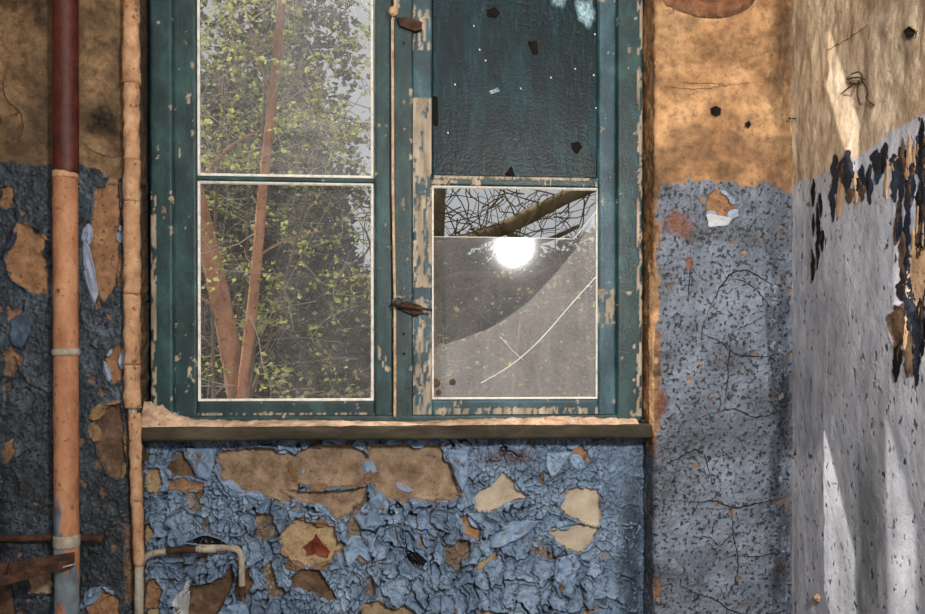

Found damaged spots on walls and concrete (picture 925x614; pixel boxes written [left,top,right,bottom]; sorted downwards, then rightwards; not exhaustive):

crack [0,70,24,144]
spalling [1,221,53,294]
spalling [81,179,123,305]
spalling [705,188,739,227]
peeling [811,118,925,387]
crack [701,269,786,418]
peeling [546,443,586,478]
spalling [80,586,120,614]
spalling [171,561,255,614]
spalling [145,439,538,604]
spalling [548,482,607,598]
crack [657,449,786,614]